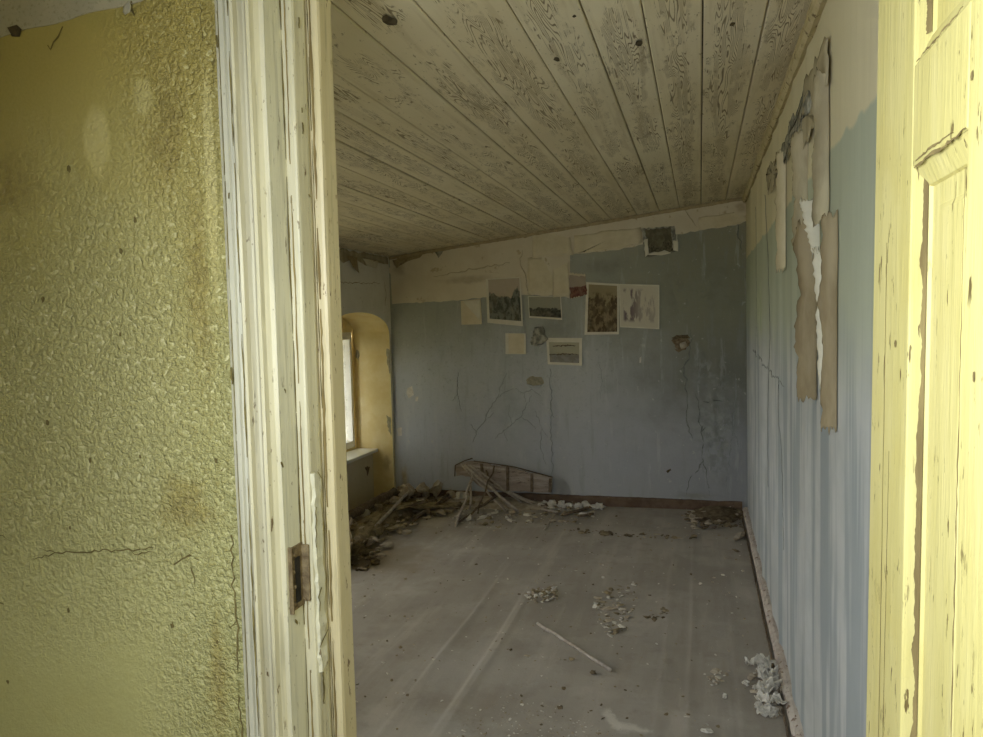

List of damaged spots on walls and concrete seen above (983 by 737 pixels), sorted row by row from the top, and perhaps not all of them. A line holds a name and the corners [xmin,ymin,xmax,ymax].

flaking render [7,25,22,37]
crack [35,547,154,559]
crack [174,554,195,584]